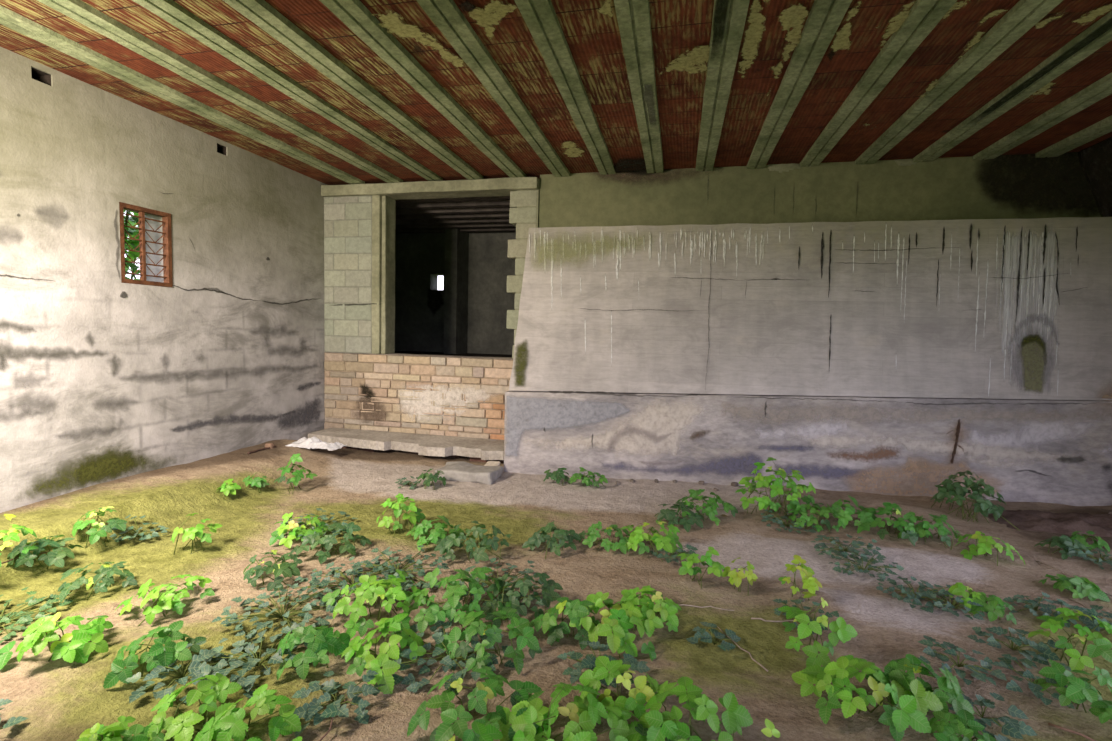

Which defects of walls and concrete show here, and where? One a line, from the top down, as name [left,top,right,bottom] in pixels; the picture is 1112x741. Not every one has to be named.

peeling [371,11,464,67]
peeling [469,0,518,39]
peeling [660,45,710,74]
peeling [738,0,808,96]
crack [0,273,53,281]
crack [112,211,120,274]
crack [173,285,376,306]
leakage [812,225,917,317]
leakage [936,137,1112,396]
leakage [0,337,97,368]
leakage [172,382,320,431]
leakage [777,465,867,479]